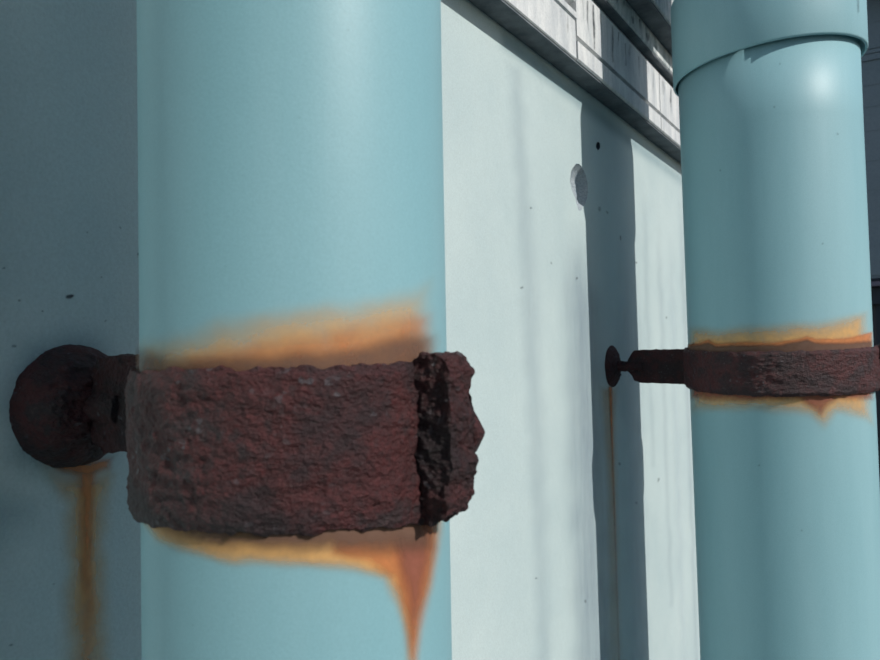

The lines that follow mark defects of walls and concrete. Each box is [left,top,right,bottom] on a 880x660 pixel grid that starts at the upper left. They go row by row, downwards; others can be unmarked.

spalling [570,164,588,211]
rust [137,313,425,372]
rust [688,320,872,352]
rust [693,390,870,417]
rust [61,461,108,654]
rust [152,524,433,646]